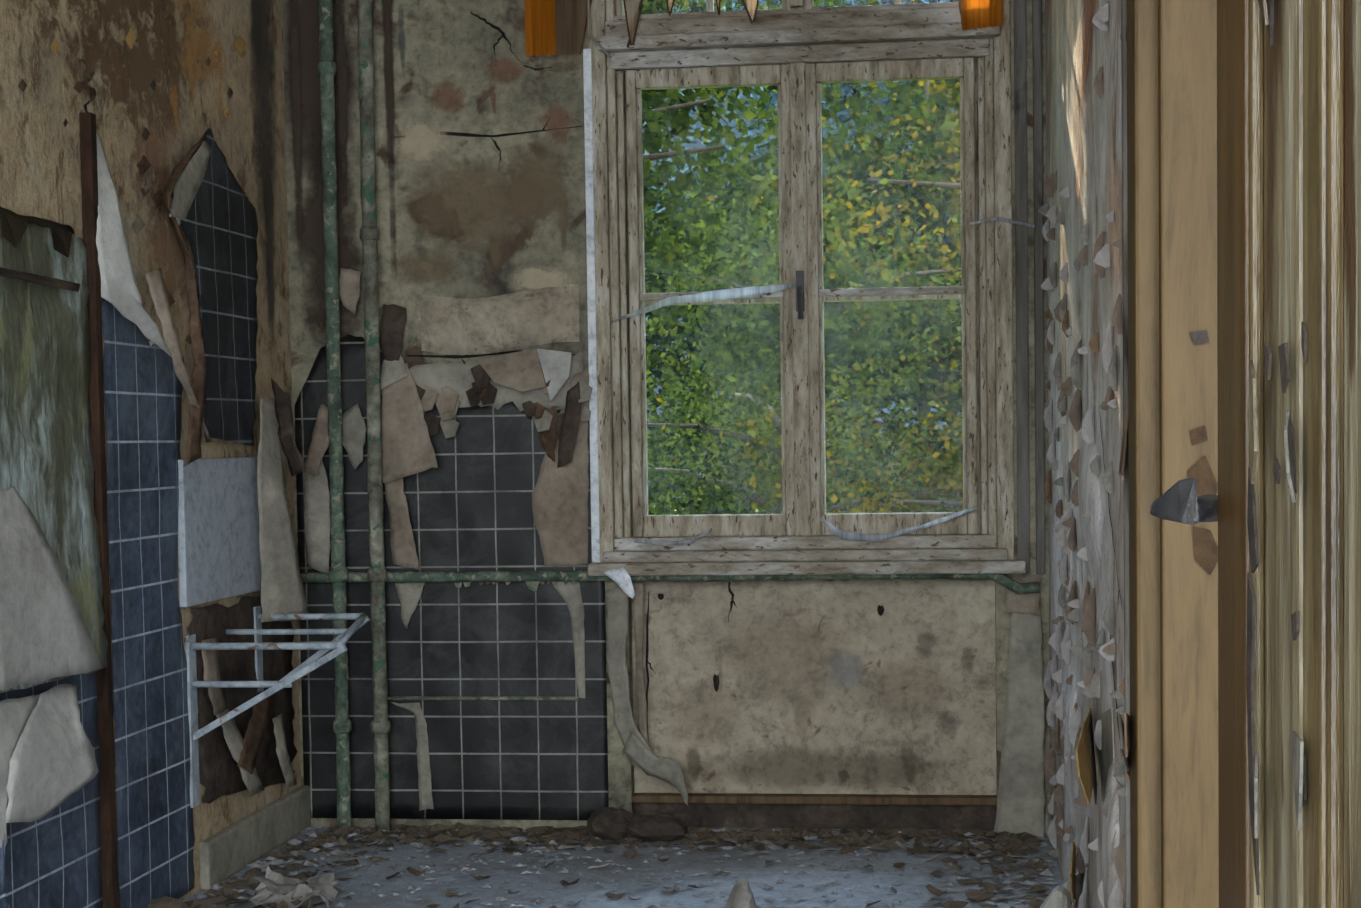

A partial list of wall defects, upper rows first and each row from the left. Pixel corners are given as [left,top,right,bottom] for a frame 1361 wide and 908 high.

damp [23,0,209,129]
damp [382,0,405,186]
rust [1080,0,1095,89]
peeling [1092,3,1127,42]
spalling [0,206,74,258]
damp [251,0,360,340]
peeling [1038,171,1070,242]
spalling [409,349,592,439]
peeling [1249,321,1308,484]
peeling [1273,410,1297,503]
peeling [1041,211,1131,908]
peeling [1291,731,1307,831]